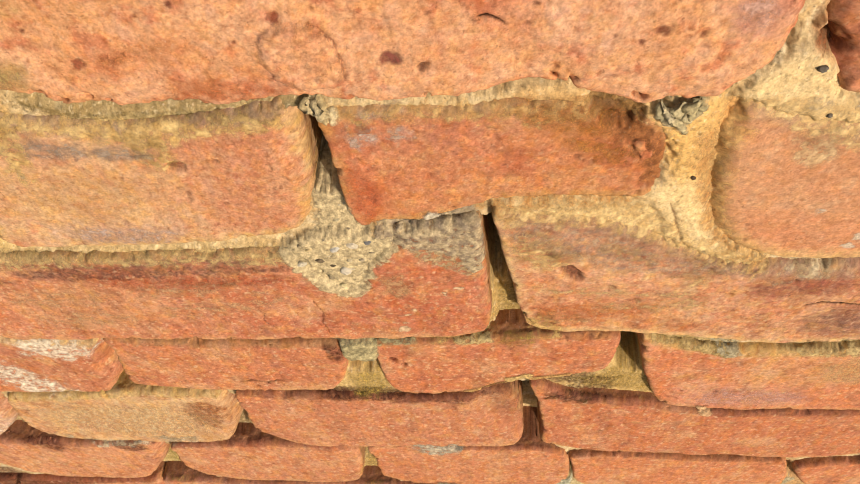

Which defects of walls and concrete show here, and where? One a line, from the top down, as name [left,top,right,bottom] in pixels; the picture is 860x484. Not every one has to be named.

leakage [17,339,97,361]
leakage [0,365,66,392]
leakage [94,439,148,451]